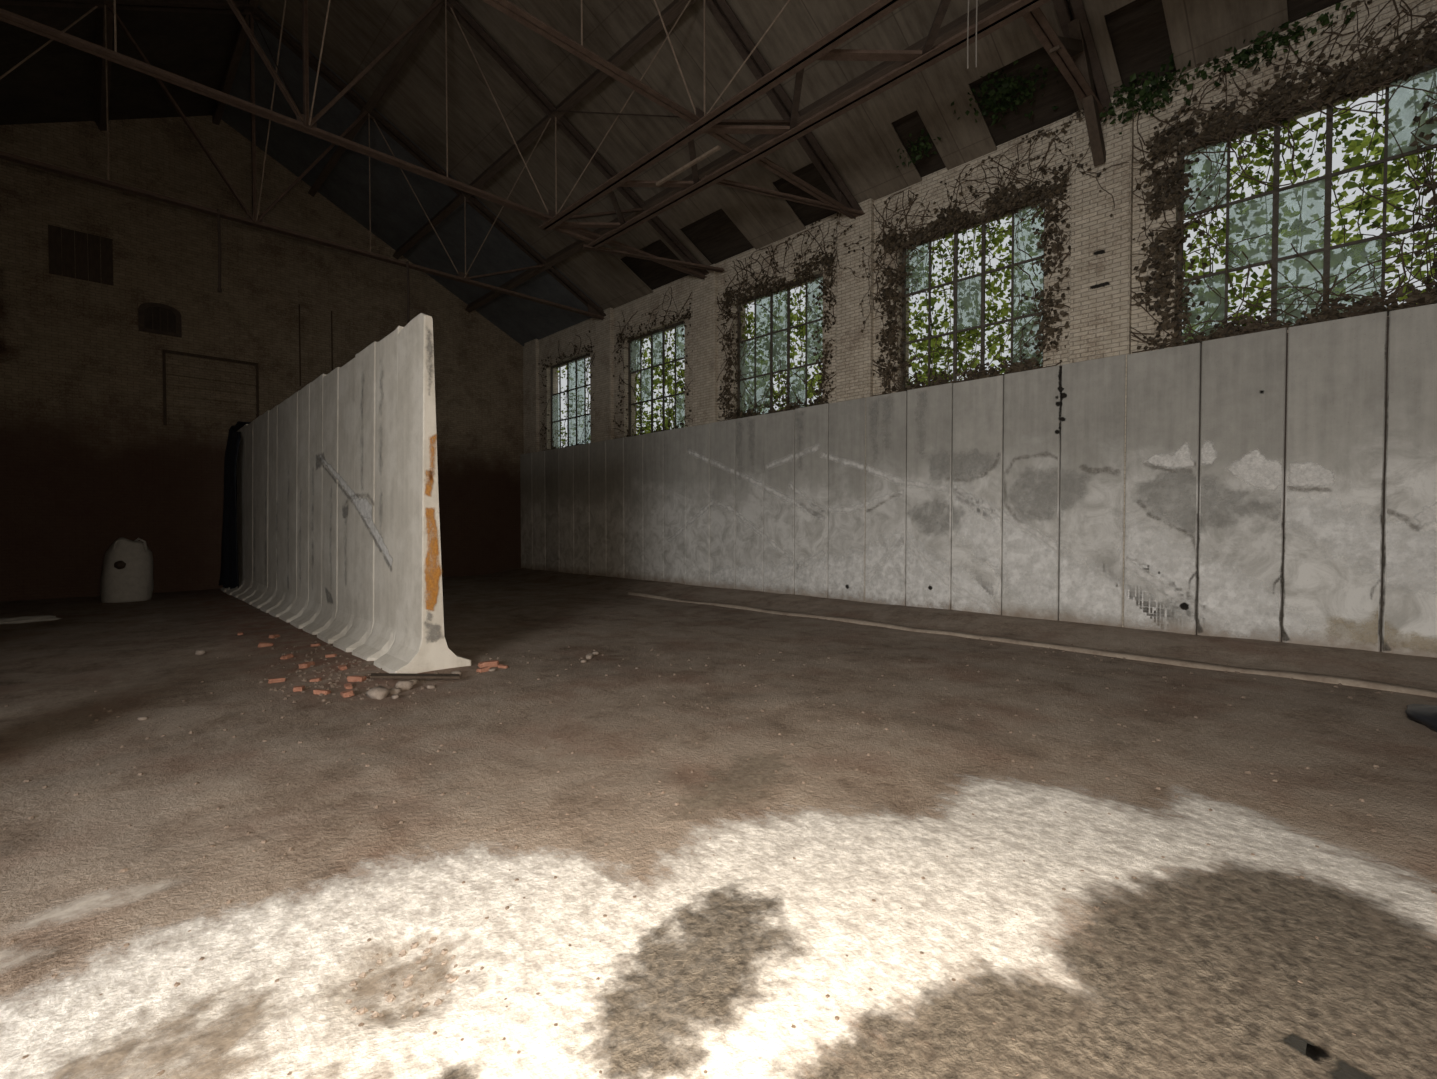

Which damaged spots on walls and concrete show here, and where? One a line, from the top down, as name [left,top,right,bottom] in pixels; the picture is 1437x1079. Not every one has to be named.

corrosion [425,434,441,611]
leakage [668,419,1304,635]